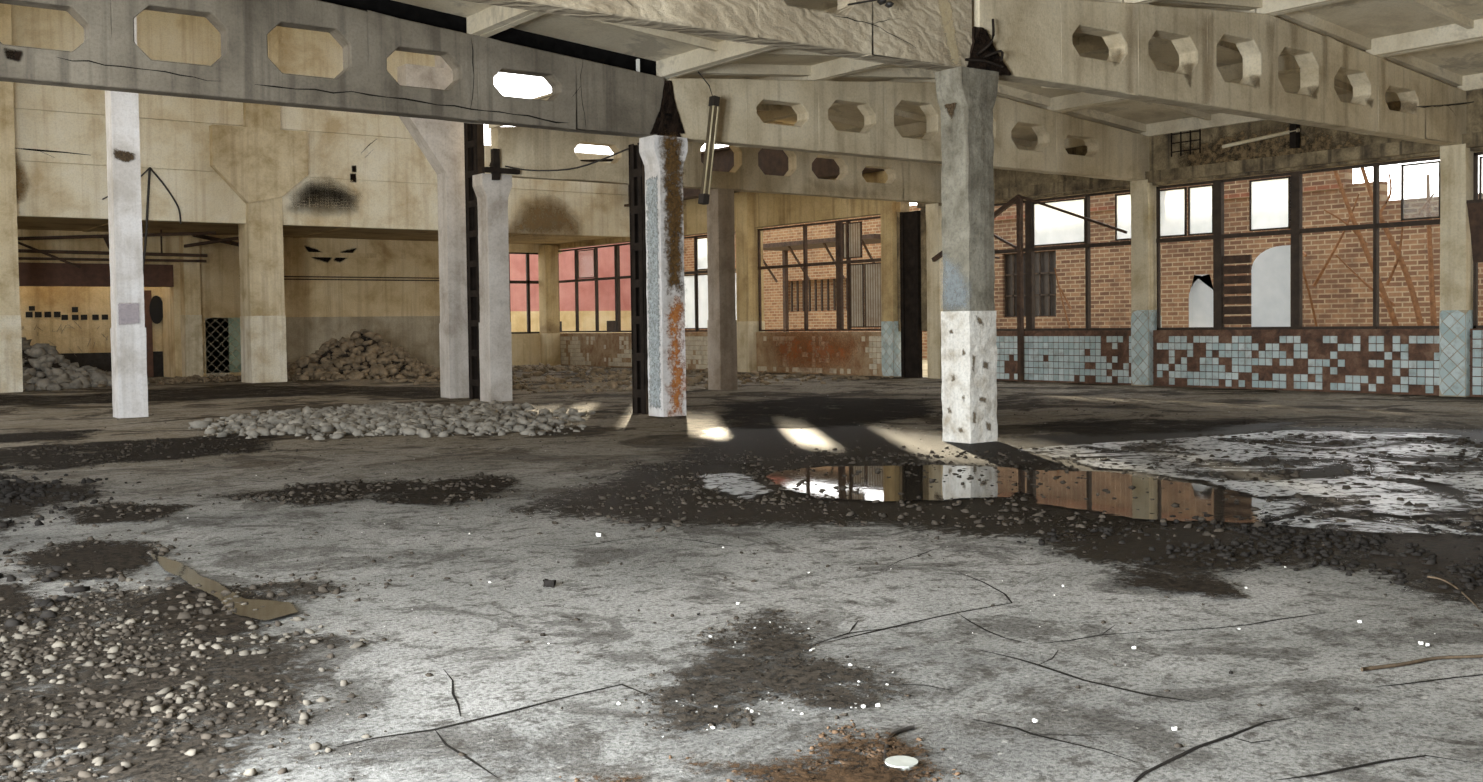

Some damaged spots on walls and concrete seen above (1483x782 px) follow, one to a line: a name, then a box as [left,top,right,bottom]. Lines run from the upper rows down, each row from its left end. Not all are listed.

corrosion [666,296,687,417]